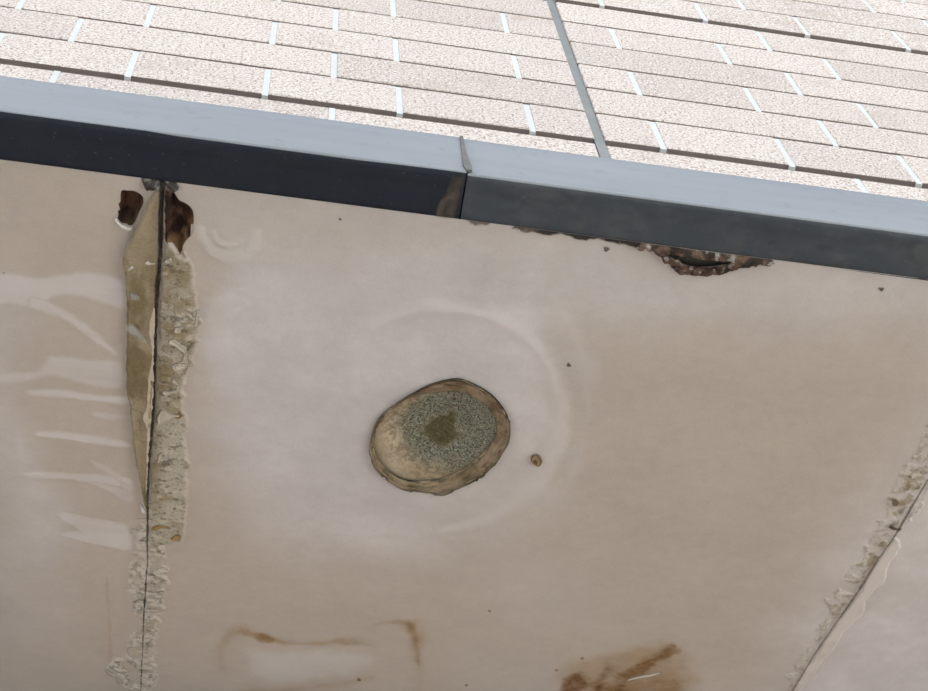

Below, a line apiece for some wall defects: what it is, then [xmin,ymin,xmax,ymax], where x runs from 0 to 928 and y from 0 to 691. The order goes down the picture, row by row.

damp [0,269,132,422]
damp [10,422,138,504]
crack [140,181,166,687]
peeling [114,190,204,549]
spalling [513,227,774,277]
peeling [783,418,928,691]
crack [792,480,928,691]